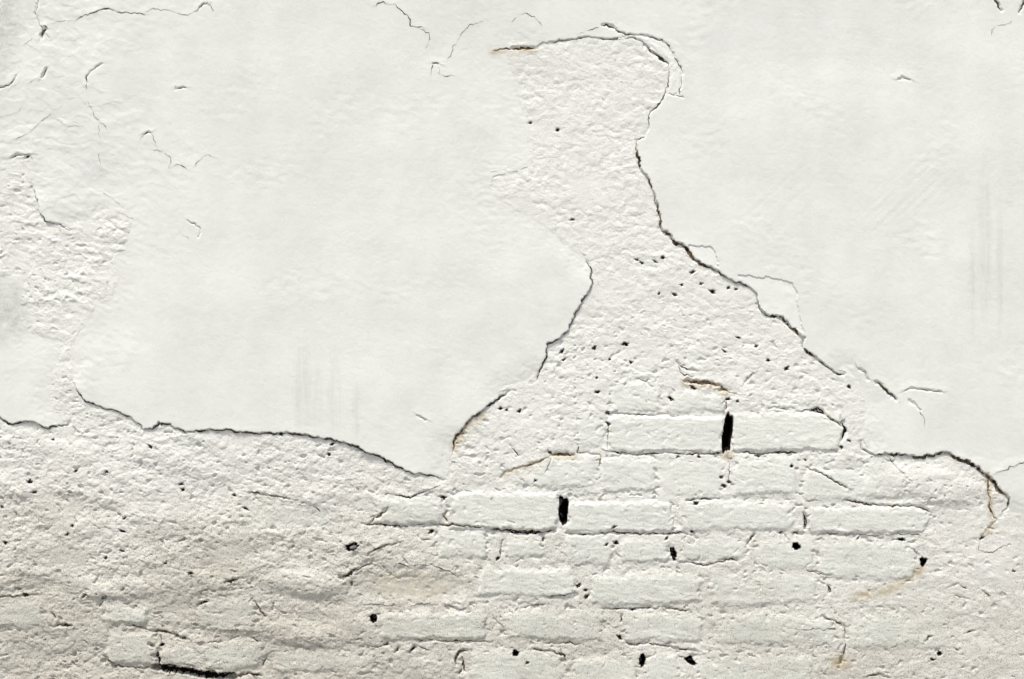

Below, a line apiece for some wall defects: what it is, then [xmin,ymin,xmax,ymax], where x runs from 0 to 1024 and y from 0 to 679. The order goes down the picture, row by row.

crack [25,3,214,44]
crack [376,1,473,77]
crack [495,45,533,53]
crack [582,24,682,97]
spalling [634,36,680,95]
spalling [0,160,133,354]
spalling [671,239,718,272]
spalling [742,275,803,331]
spalling [947,453,985,475]
crack [978,462,1024,553]